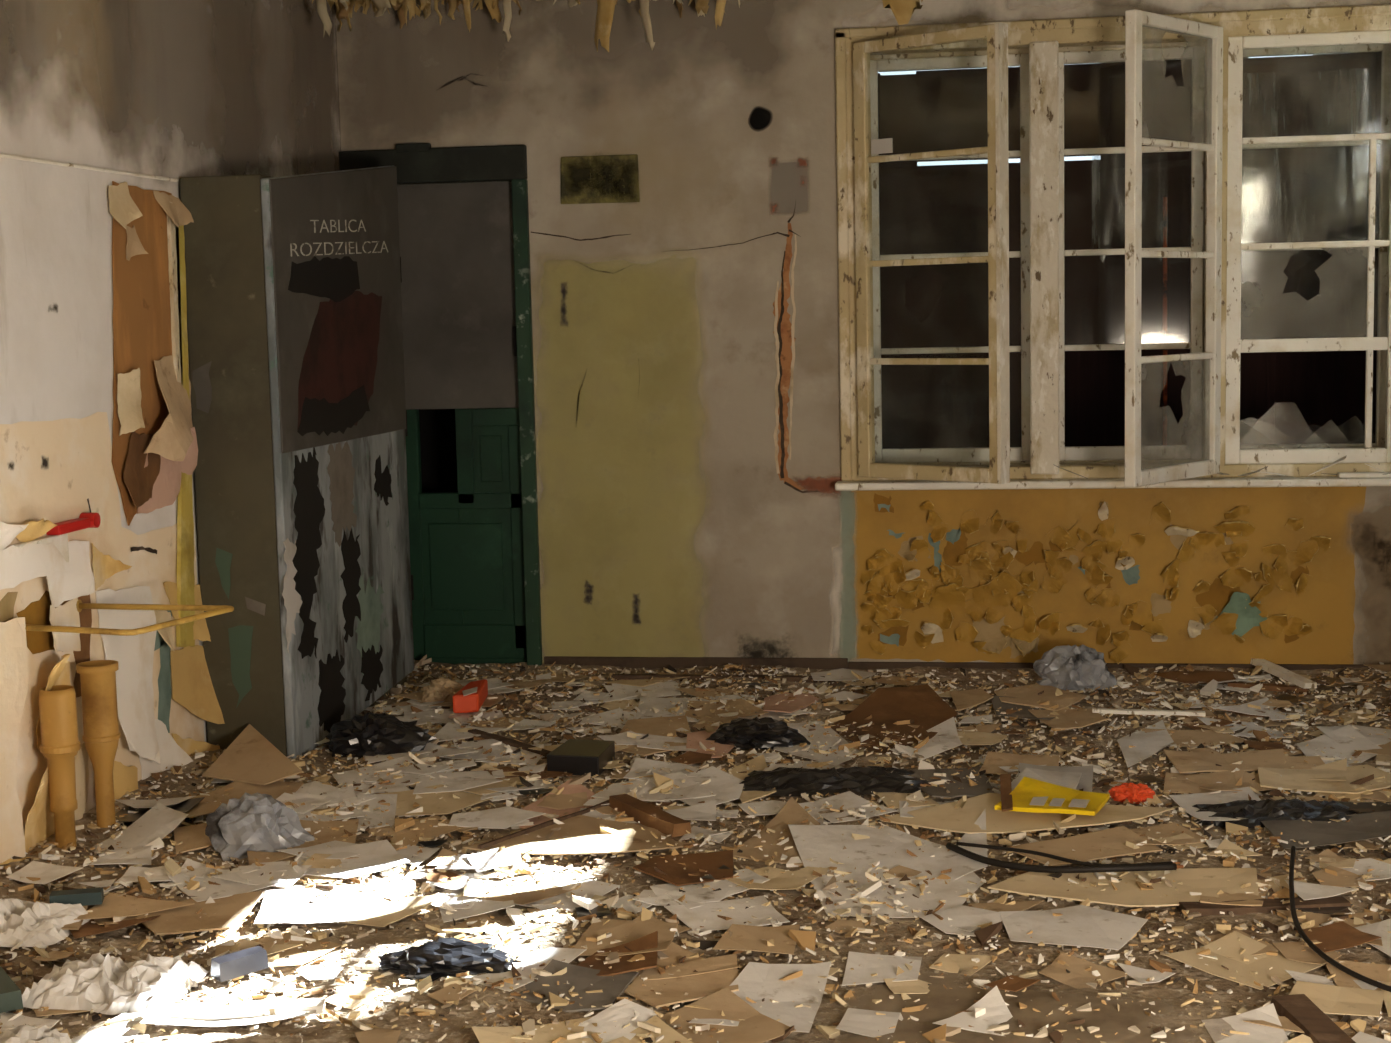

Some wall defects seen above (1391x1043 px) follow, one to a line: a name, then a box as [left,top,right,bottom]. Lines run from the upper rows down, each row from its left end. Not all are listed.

peeling [831,491,1331,664]
damp [1350,502,1391,665]
peeling [0,518,225,865]